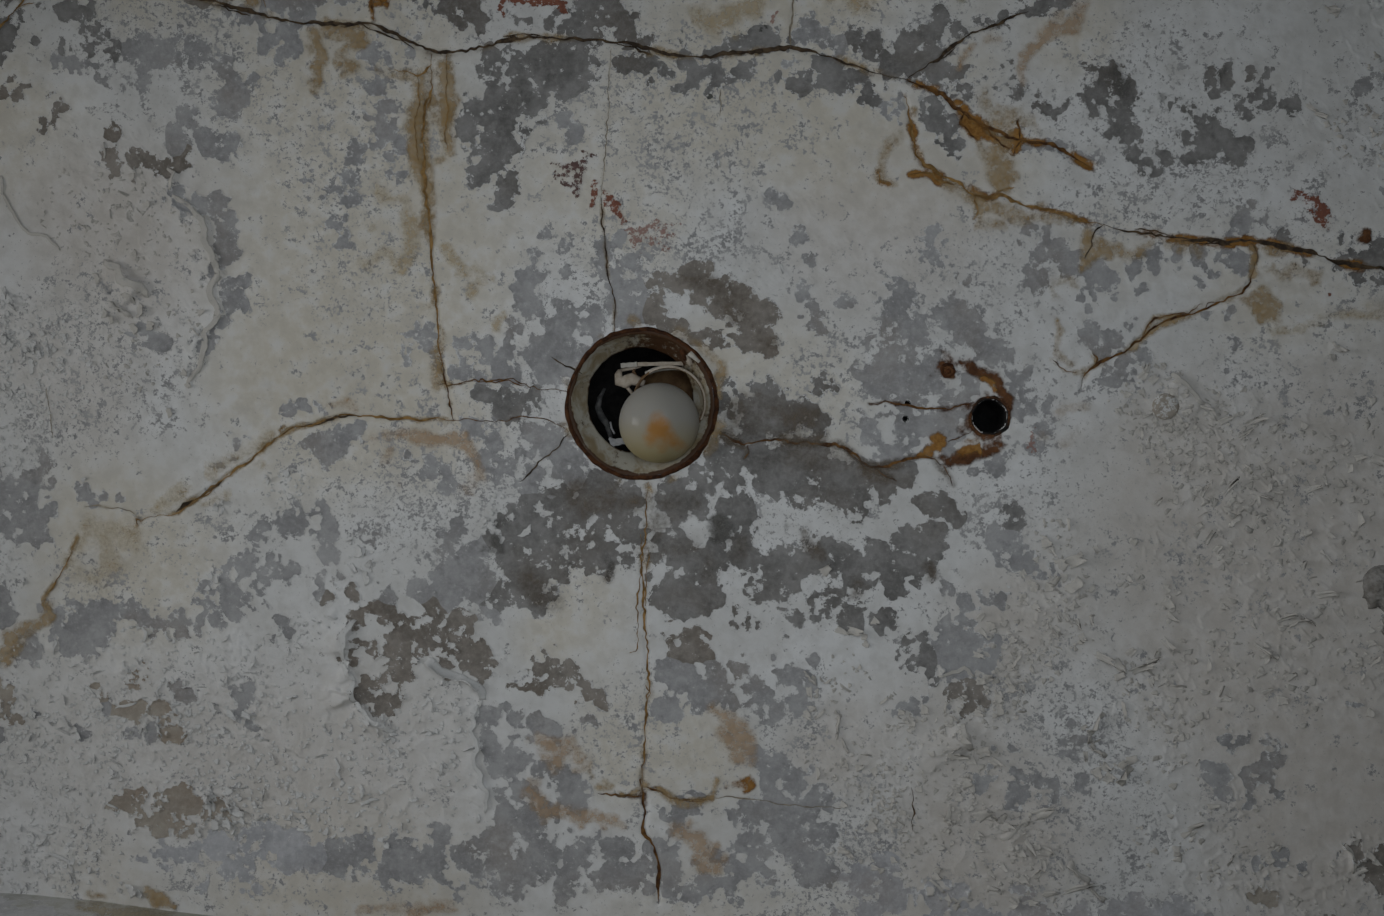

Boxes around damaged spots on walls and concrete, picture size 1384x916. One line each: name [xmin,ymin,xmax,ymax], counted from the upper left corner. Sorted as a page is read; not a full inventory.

crack [0,0,33,28]
flaking render [183,0,357,67]
flaking render [299,30,421,251]
water stain [398,61,460,274]
crack [42,0,1384,610]
flaking render [412,0,1384,212]
corrosion [917,350,1014,467]
corrosion [953,99,1024,155]
corrosion [1357,228,1371,244]
flaking render [0,186,1384,916]
crack [601,482,841,903]